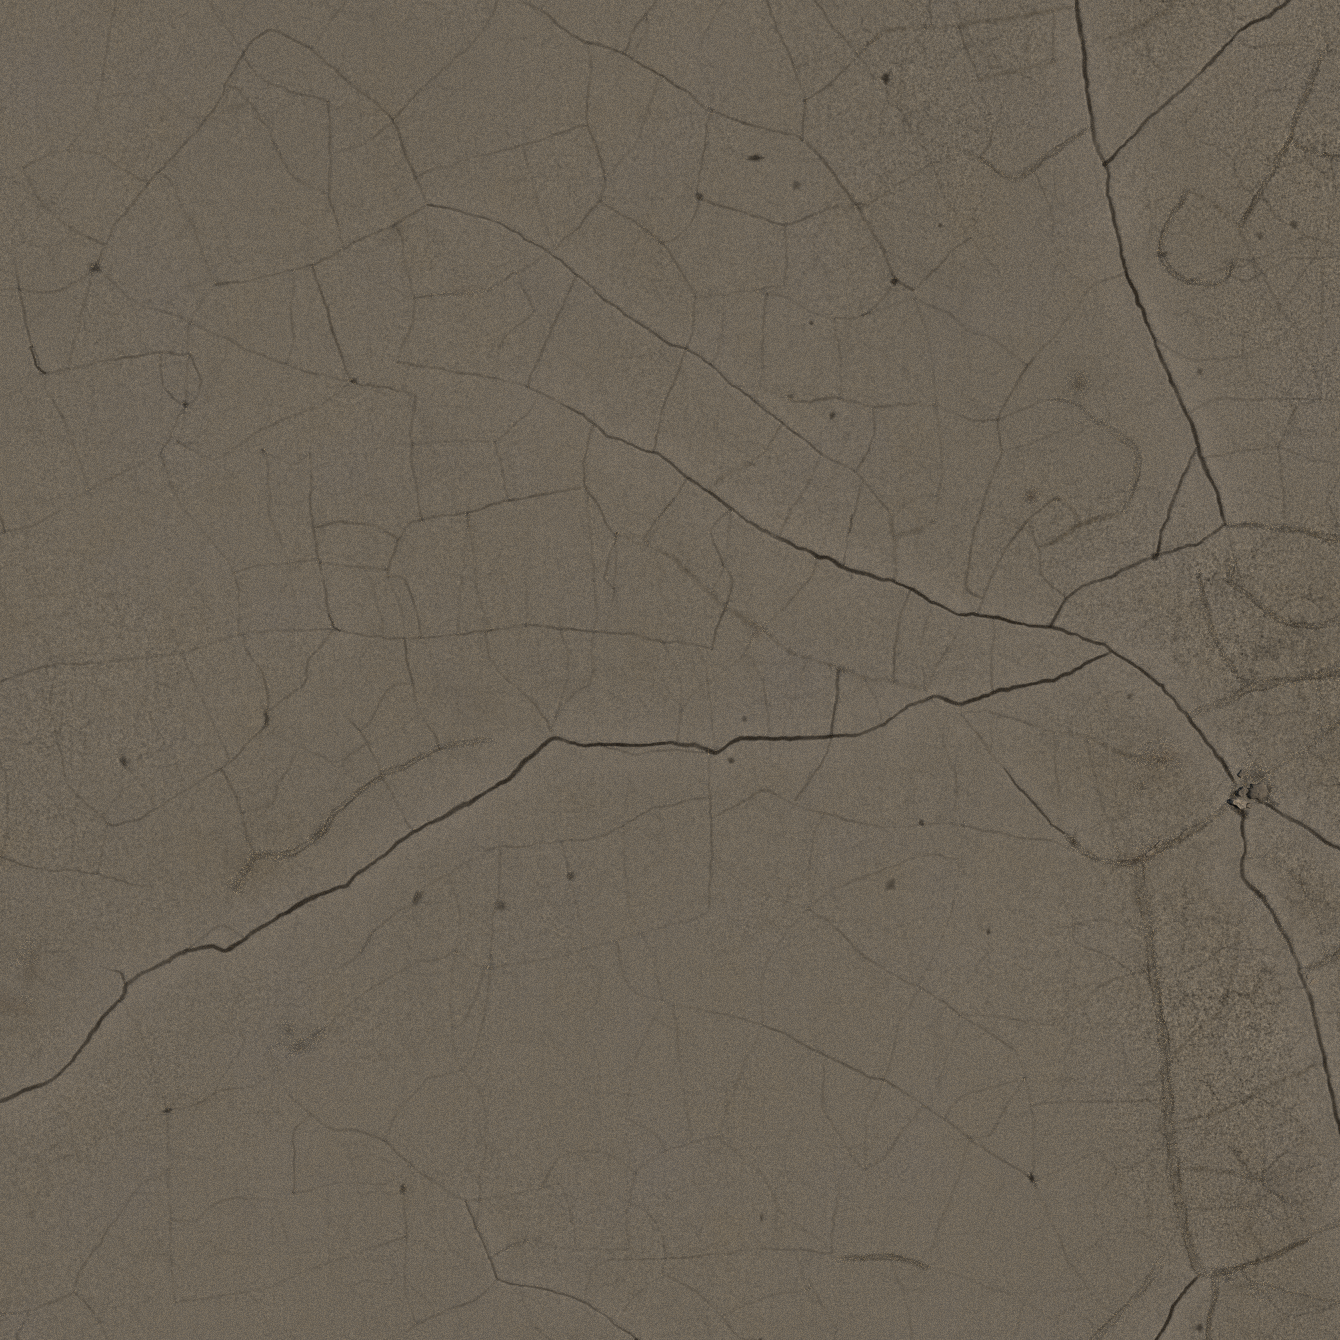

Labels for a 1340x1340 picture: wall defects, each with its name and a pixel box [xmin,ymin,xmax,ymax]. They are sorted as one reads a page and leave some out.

crack [1203,0,1290,70]
crack [1075,0,1224,556]
crack [784,539,1234,781]
crack [183,734,853,954]
crack [1241,803,1293,950]
crack [1310,830,1340,850]
crack [9,1000,121,1099]
crack [1309,996,1340,1132]
crack [1155,1277,1197,1340]